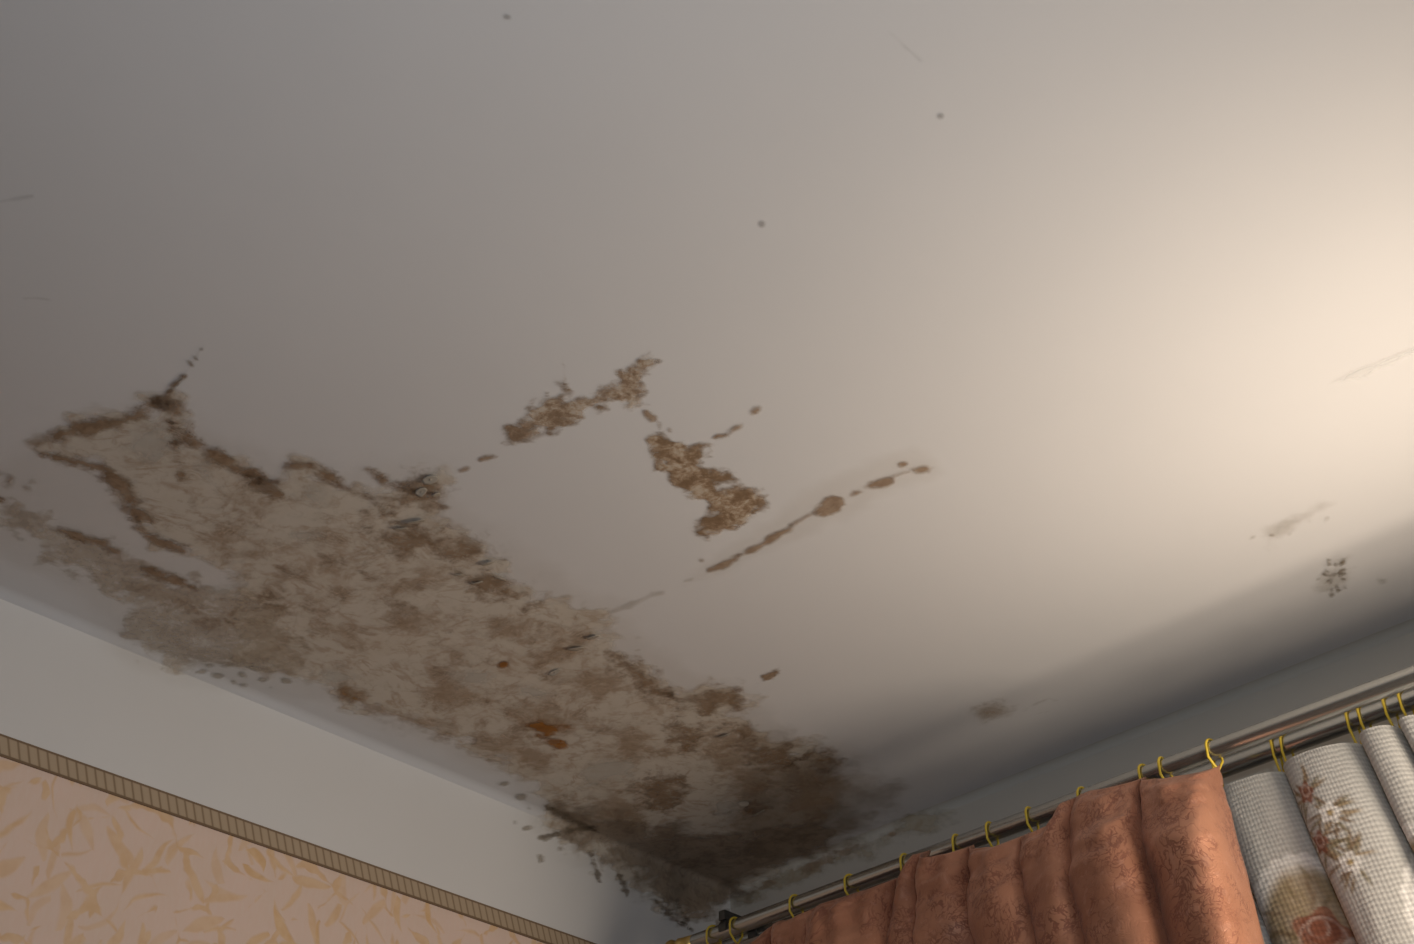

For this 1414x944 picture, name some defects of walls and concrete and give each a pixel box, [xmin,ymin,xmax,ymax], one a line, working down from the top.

water stain [504,359,766,538]
water stain [816,463,928,516]
water stain [30,390,872,930]